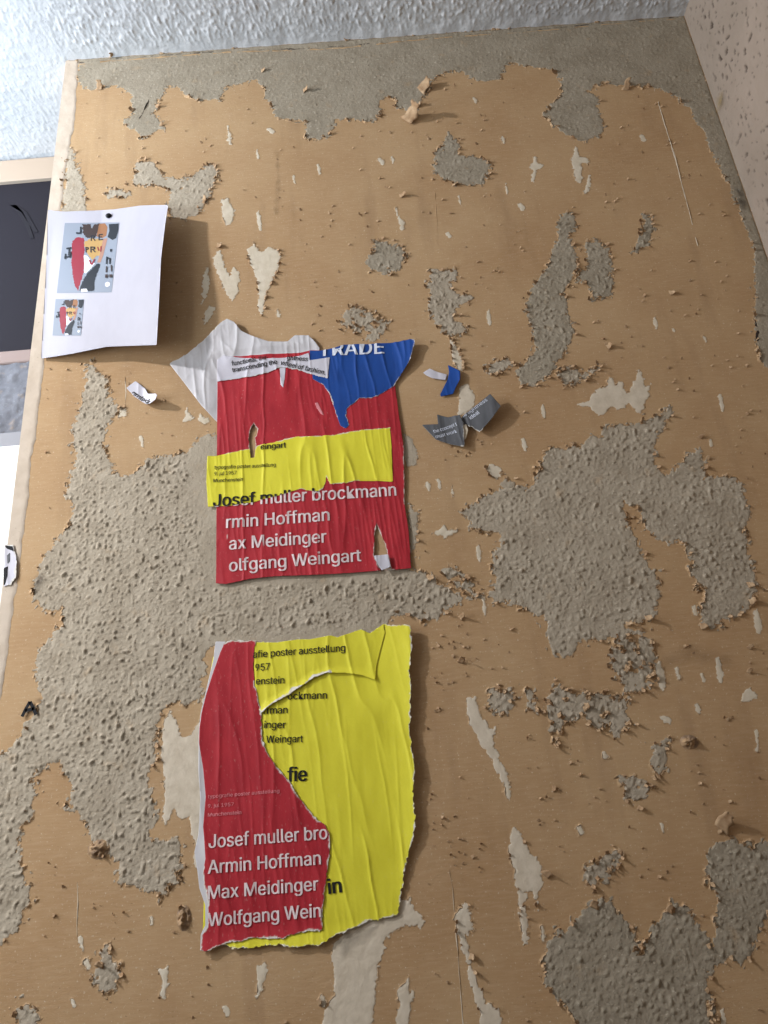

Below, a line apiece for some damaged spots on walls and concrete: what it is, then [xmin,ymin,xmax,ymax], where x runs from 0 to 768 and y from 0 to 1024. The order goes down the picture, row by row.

flaking render [75,16,768,390]
flaking render [0,357,768,947]
flaking render [538,811,768,1024]